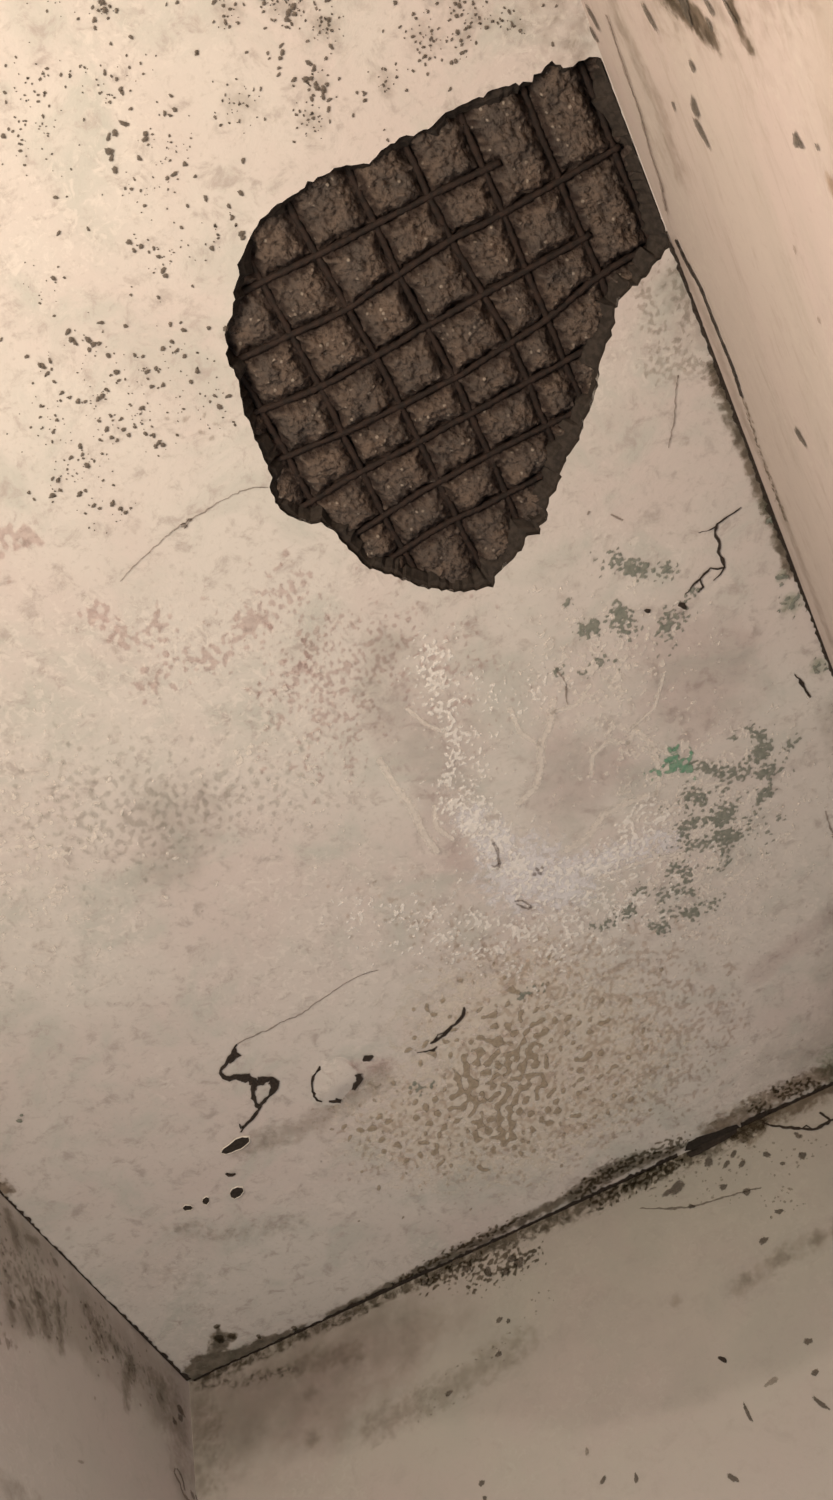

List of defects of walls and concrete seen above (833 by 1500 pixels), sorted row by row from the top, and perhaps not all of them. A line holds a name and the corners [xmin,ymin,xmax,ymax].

damp [792,132,819,151]
spalling [225,57,669,592]
crack [644,231,833,698]
damp [709,363,790,572]
efflorescence [333,576,829,999]
crack [219,1044,279,1133]
crack [417,1007,466,1053]
mould [323,1079,822,1327]
mould [185,1325,306,1381]